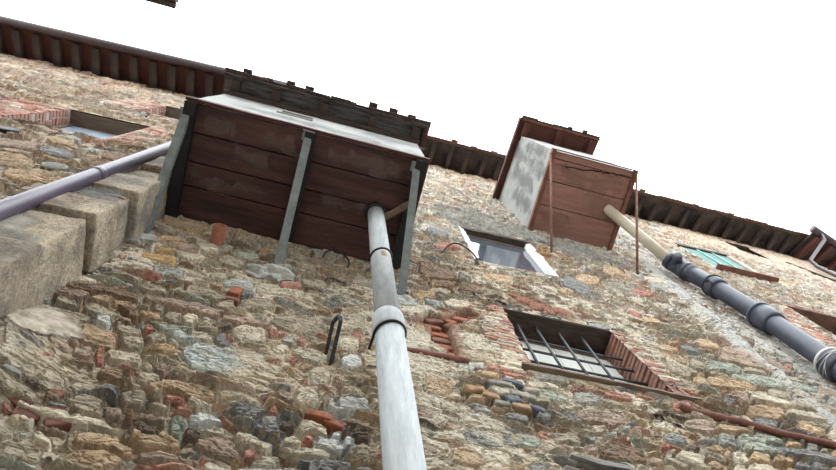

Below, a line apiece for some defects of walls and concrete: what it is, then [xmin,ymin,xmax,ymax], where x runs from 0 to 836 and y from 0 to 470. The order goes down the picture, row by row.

crack [558,164,631,178]
rust [535,246,569,260]